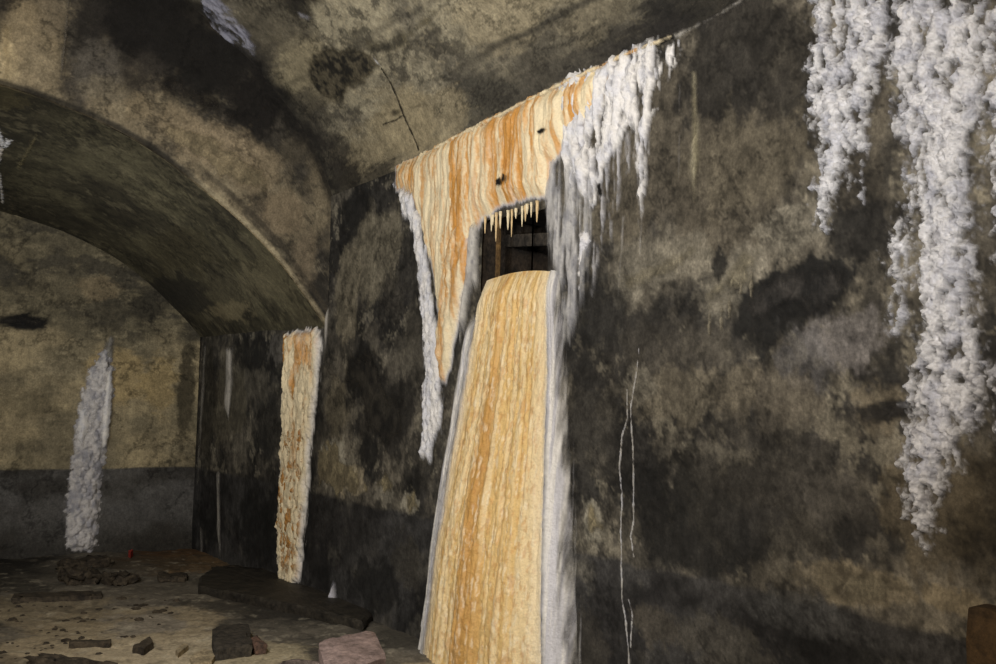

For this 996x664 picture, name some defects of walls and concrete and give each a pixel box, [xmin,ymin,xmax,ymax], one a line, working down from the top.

efflorescence [202,0,253,49]
crack [381,68,419,150]
crack [0,132,12,203]
leakage [804,0,996,550]
crack [619,409,634,664]